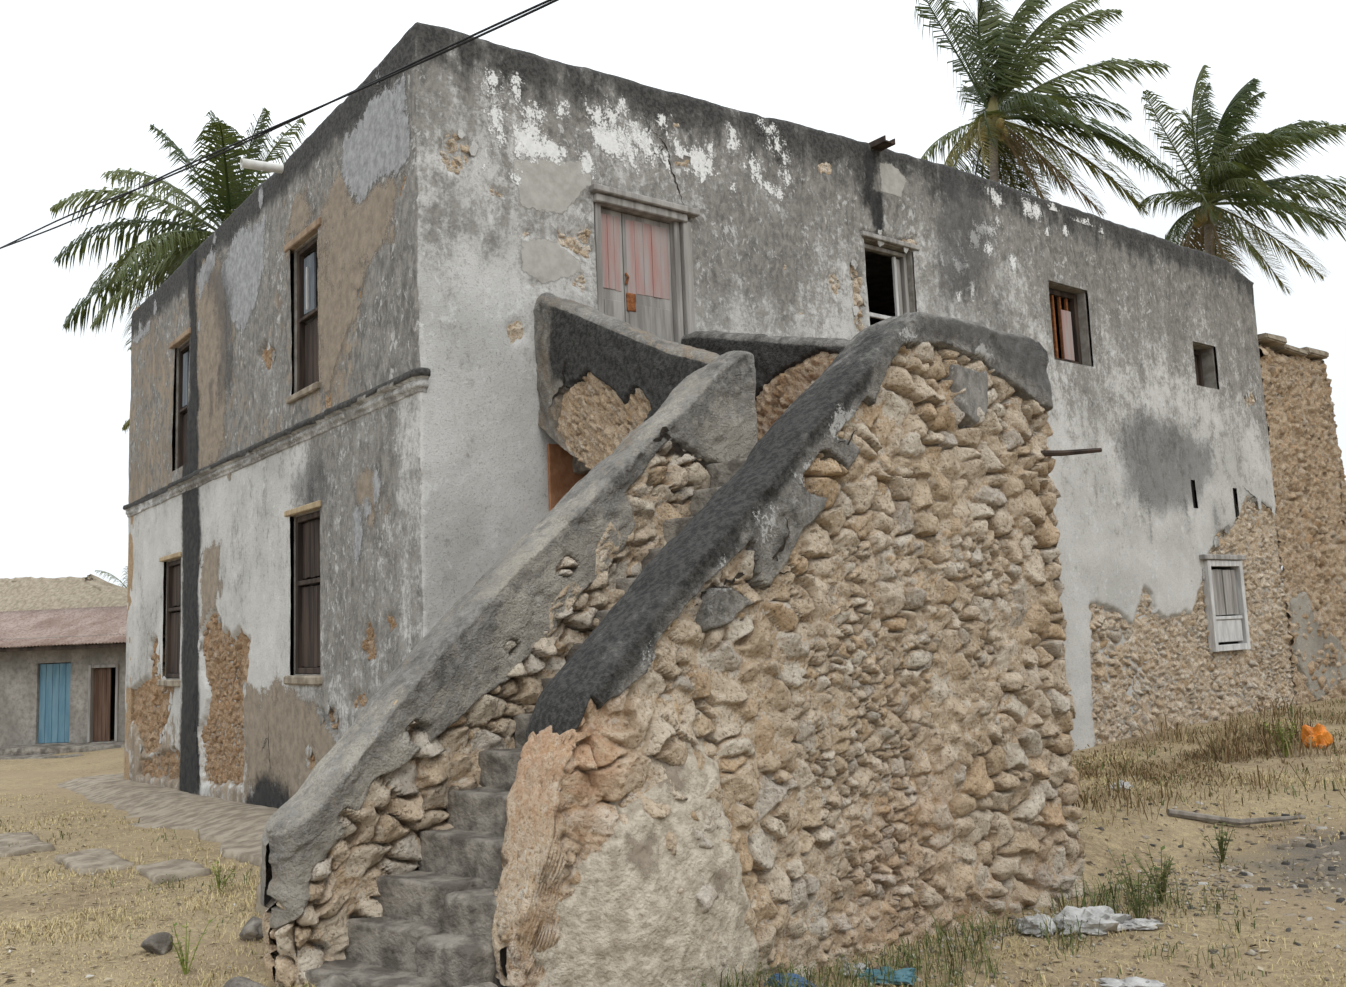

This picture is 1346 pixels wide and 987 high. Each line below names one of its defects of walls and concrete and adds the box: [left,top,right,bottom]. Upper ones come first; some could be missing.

spalling [558,229,591,258]
peeling [440,67,794,203]
spalling [133,634,180,780]
water stain [179,251,201,795]
peeling [198,541,339,799]
spalling [1088,496,1298,746]